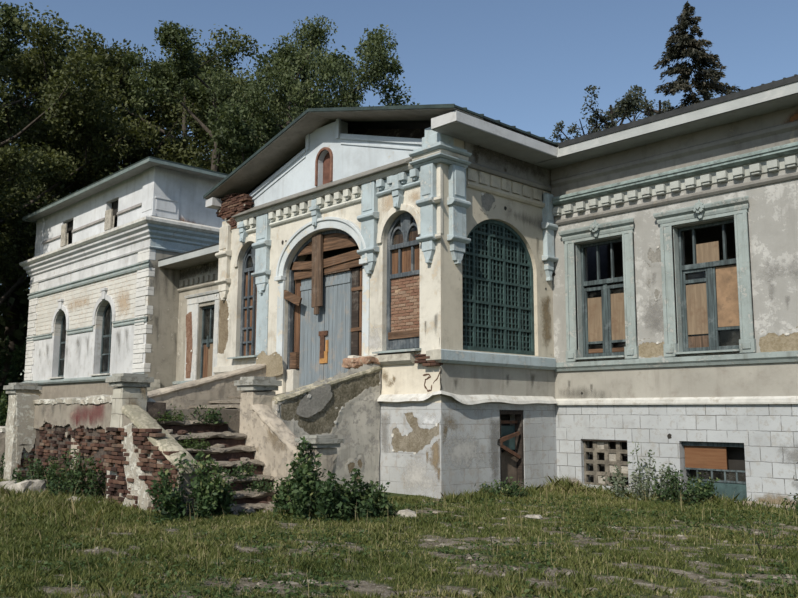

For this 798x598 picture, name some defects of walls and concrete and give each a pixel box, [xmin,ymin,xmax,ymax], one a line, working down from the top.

spalling [216,193,254,231]
spalling [215,292,232,359]
water stain [542,298,552,342]
peeling [755,325,798,353]
spalling [276,363,381,435]
crack [423,367,442,396]
spalling [15,384,179,512]
spalling [388,405,441,459]